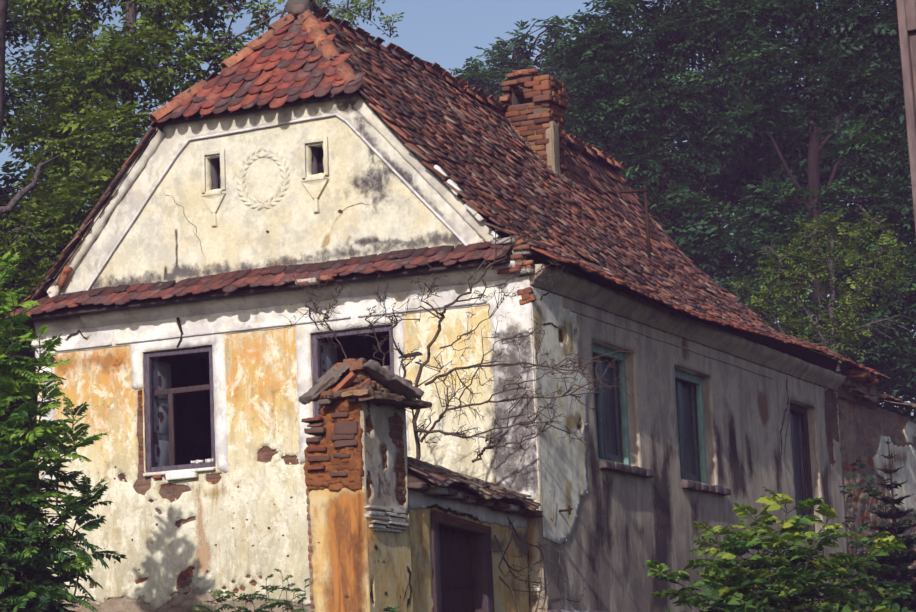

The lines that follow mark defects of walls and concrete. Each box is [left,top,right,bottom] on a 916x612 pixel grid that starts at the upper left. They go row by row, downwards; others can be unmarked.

water stain [336,99,440,212]
crack [164,193,203,254]
spalling [490,237,535,276]
crack [45,329,91,362]
flaking render [206,472,222,484]
spalling [257,399,373,499]
rust [326,491,370,612]
flaking render [381,412,527,530]
water stain [489,327,538,491]
flaking render [517,286,590,544]
water stain [651,436,673,612]
water stain [715,416,753,497]